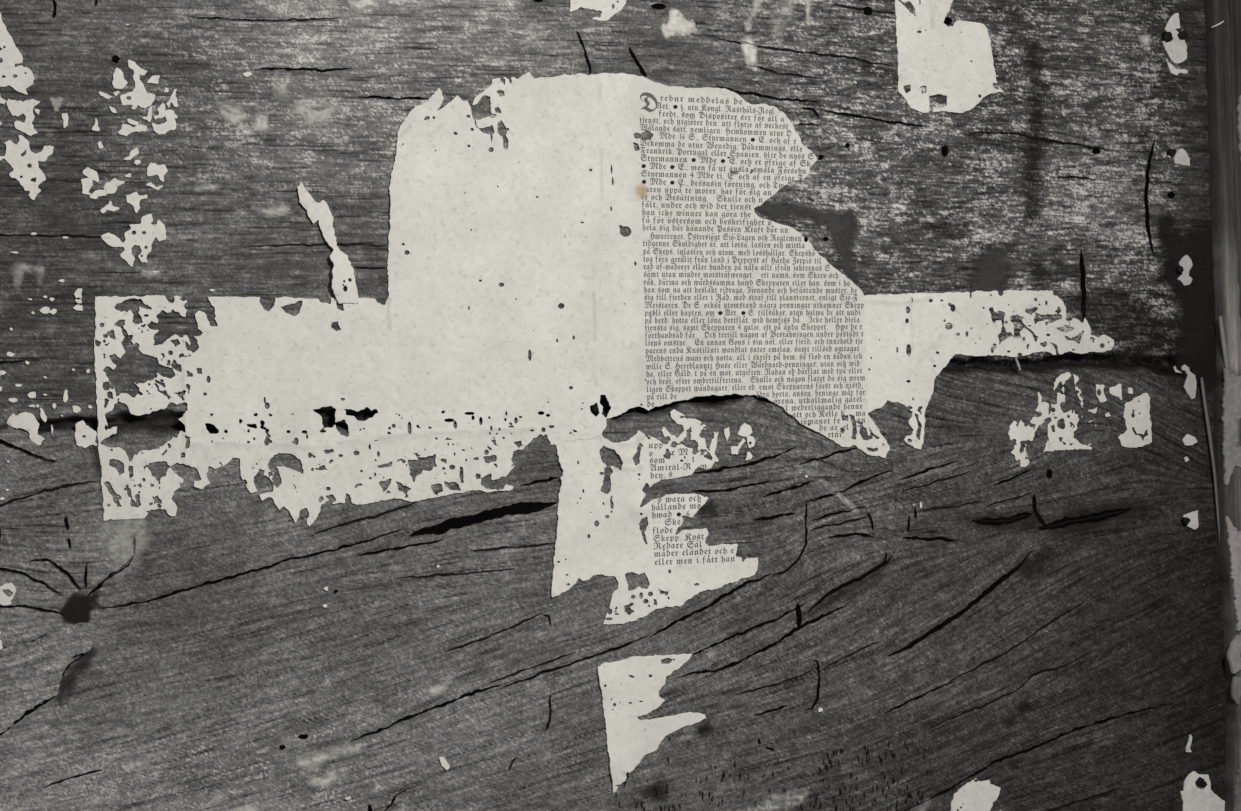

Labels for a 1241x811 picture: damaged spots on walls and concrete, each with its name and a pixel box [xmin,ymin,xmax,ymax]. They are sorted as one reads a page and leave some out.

peeling [98,68,178,136]
peeling [81,148,168,213]
crack [1145,137,1156,256]
peeling [755,201,859,280]
peeling [972,246,1010,292]
crack [0,439,39,457]
crack [0,477,559,649]
crack [350,447,1171,811]
crack [0,649,91,735]